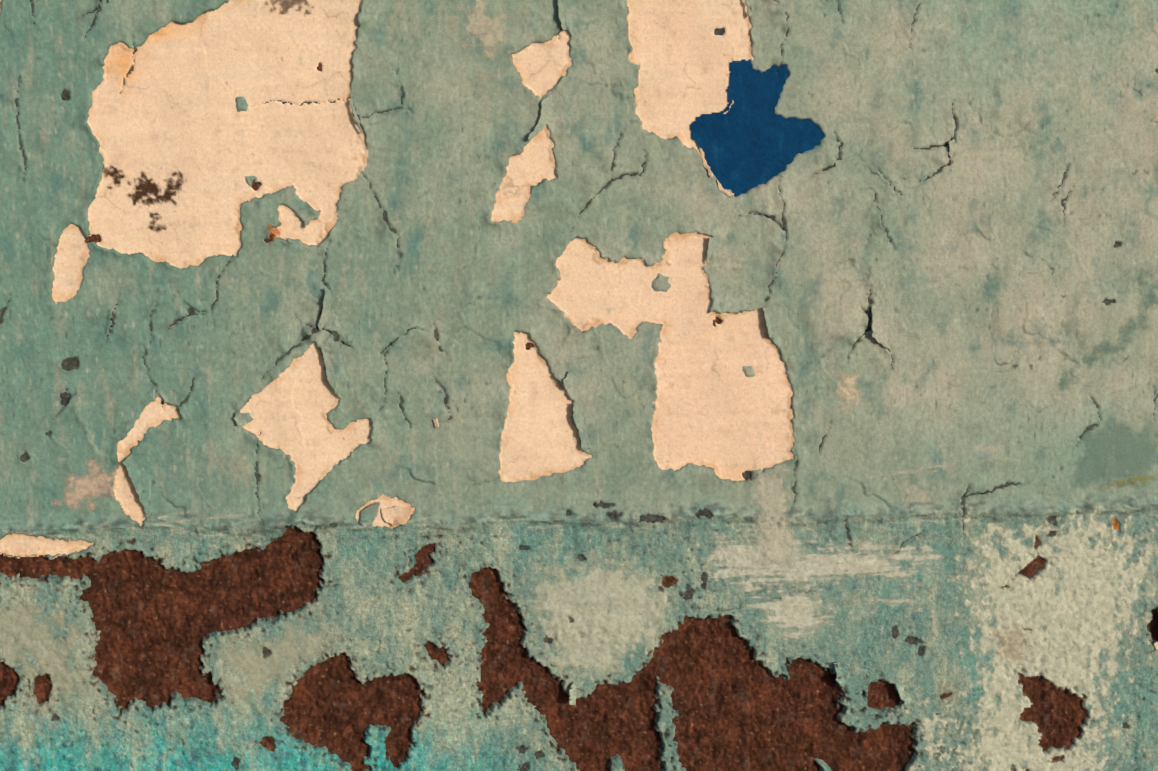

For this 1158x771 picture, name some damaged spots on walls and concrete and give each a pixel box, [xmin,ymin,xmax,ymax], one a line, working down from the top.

peeling [52,0,368,304]
crack [572,133,647,229]
peeling [627,0,825,197]
crack [871,100,957,247]
crack [142,254,234,411]
crack [260,248,353,382]
crack [380,324,451,428]
peeling [498,331,592,483]
peeling [547,232,795,481]
crack [847,285,893,369]
spalling [0,526,324,713]
spalling [469,567,915,771]